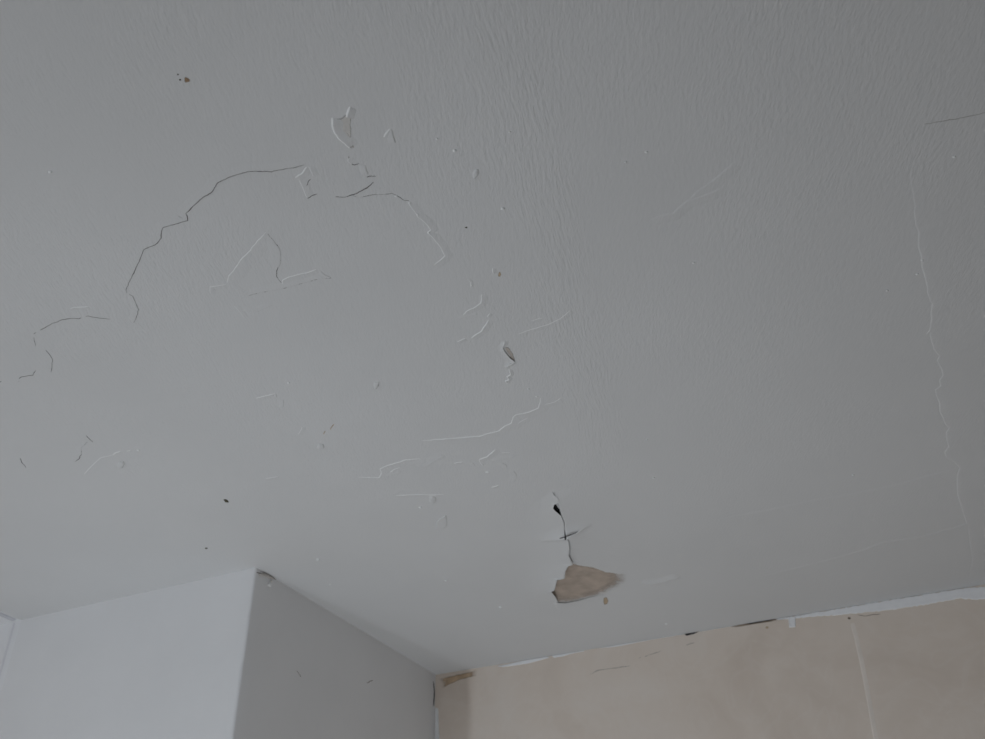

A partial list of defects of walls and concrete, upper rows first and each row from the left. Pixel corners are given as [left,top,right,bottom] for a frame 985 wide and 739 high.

crack [19,158,319,379]
peeling [511,487,654,611]